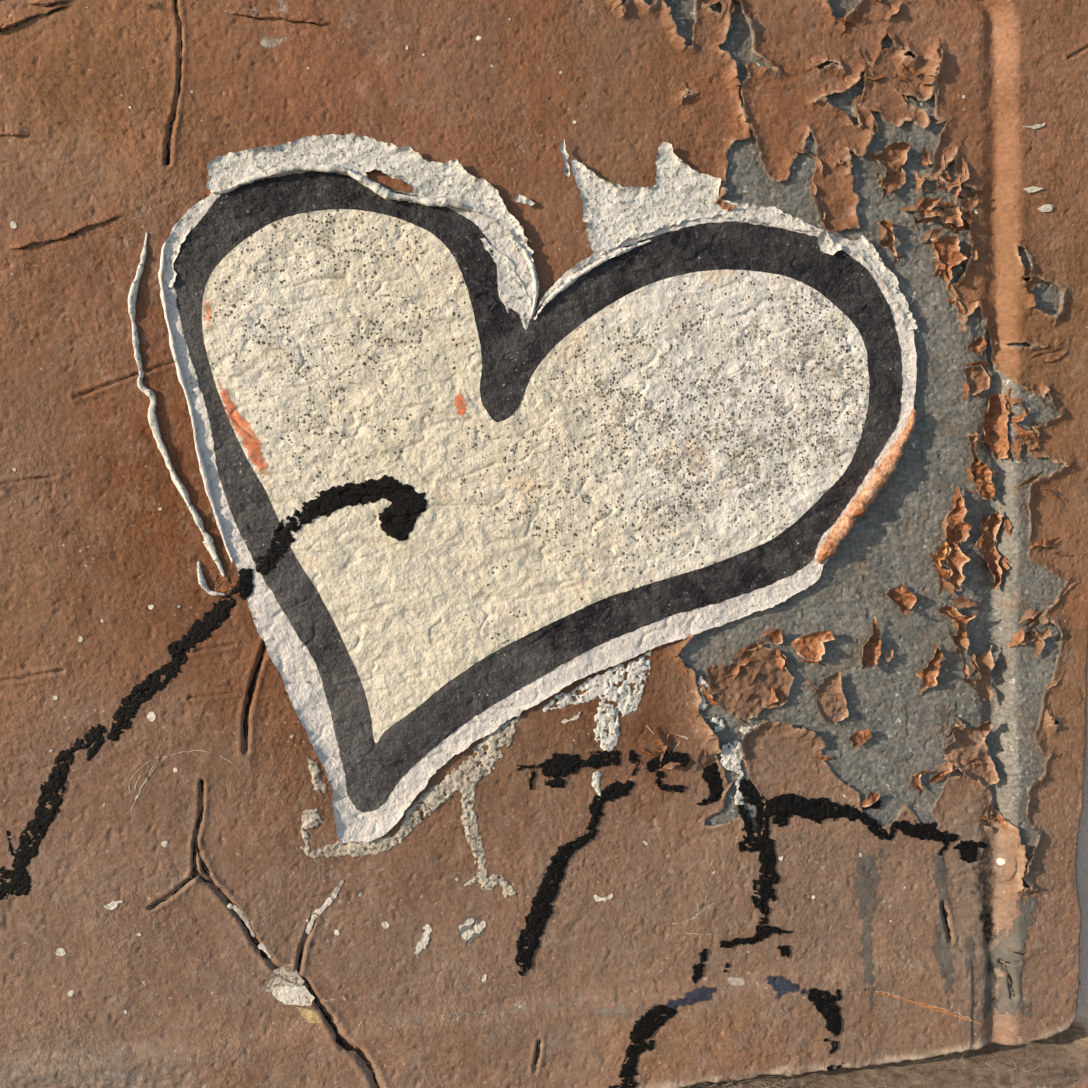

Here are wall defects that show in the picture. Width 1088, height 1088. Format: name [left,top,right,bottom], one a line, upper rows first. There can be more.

crack [166,0,183,165]
peeling [606,0,1079,901]
crack [243,642,266,750]
crack [148,780,380,1088]
leakage [853,849,891,1012]
leakage [931,812,1041,1018]